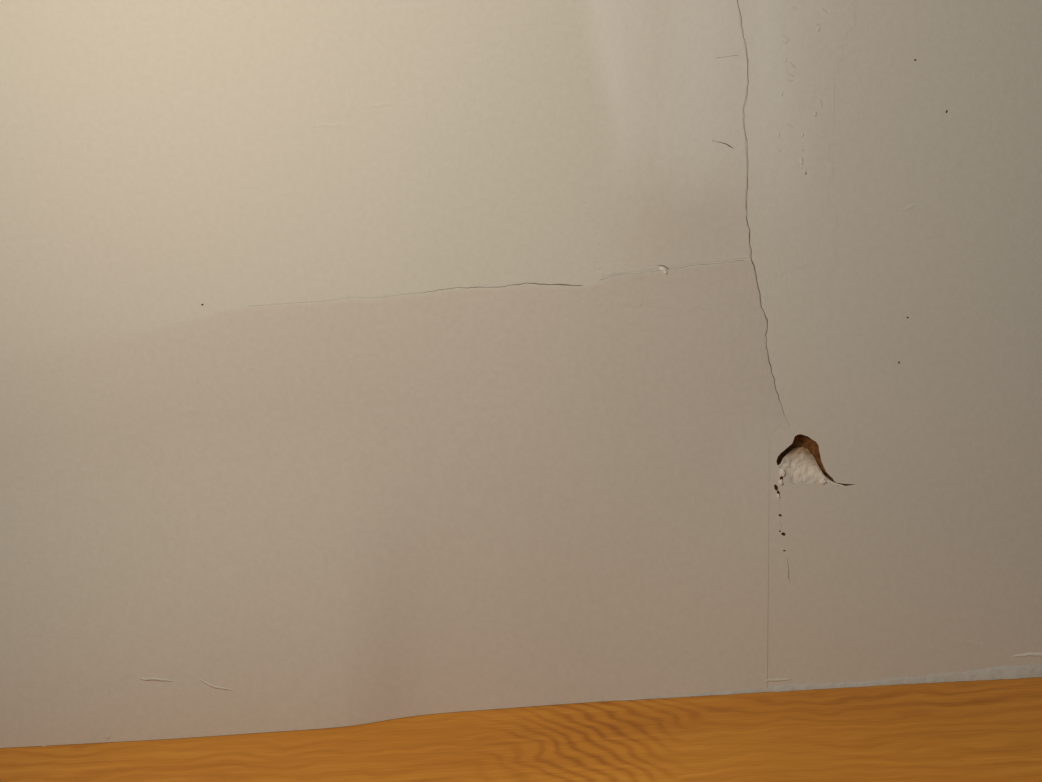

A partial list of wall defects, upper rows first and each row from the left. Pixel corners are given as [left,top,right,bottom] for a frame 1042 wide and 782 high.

crack [258,0,790,427]
spalling [774,434,856,499]